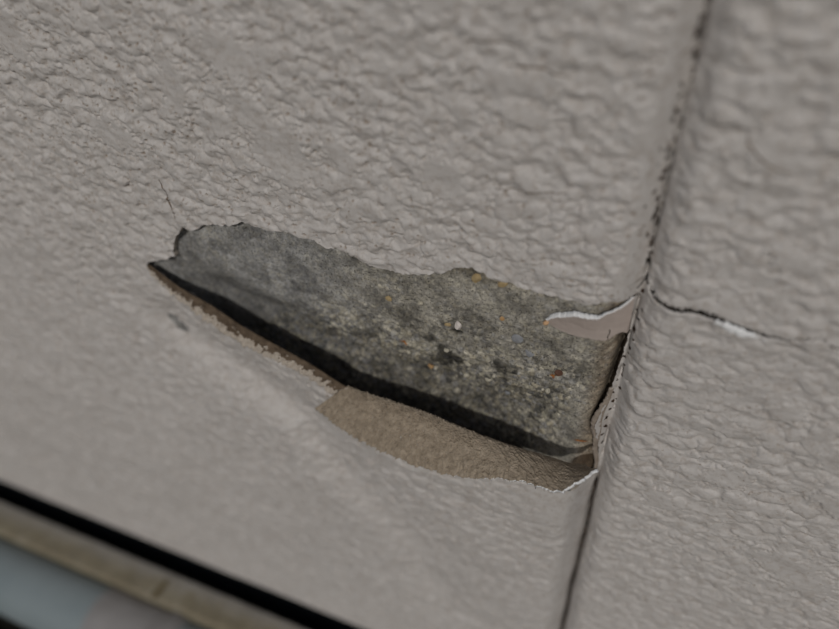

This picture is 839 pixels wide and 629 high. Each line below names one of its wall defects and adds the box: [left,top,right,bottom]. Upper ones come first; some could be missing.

peeling [146,222,635,494]
crack [632,272,839,360]